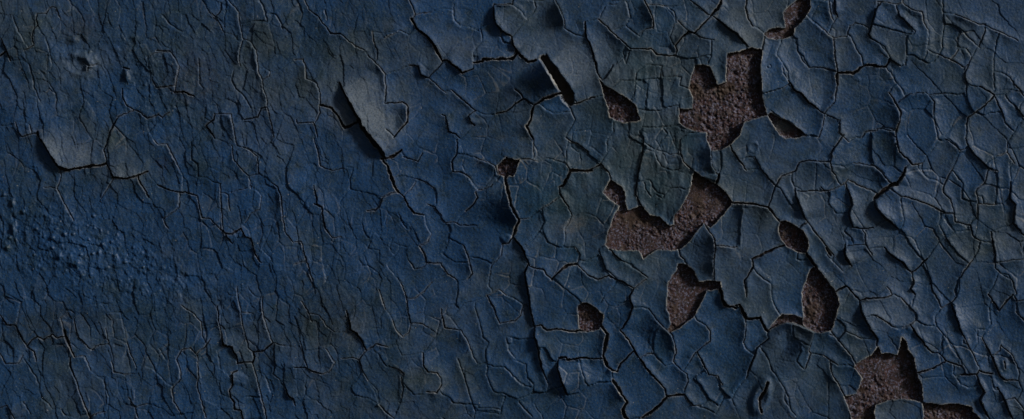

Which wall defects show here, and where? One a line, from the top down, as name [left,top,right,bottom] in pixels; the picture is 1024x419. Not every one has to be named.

crack [0,6,62,62]
peeling [597,78,643,125]
crack [555,0,766,106]
peeling [678,0,813,153]
crack [43,171,75,222]
crack [0,315,148,419]
crack [100,0,723,419]
peeling [576,301,606,334]
peeling [602,170,734,335]
peeling [765,219,842,370]
crack [669,0,1024,419]
peeling [842,335,982,419]